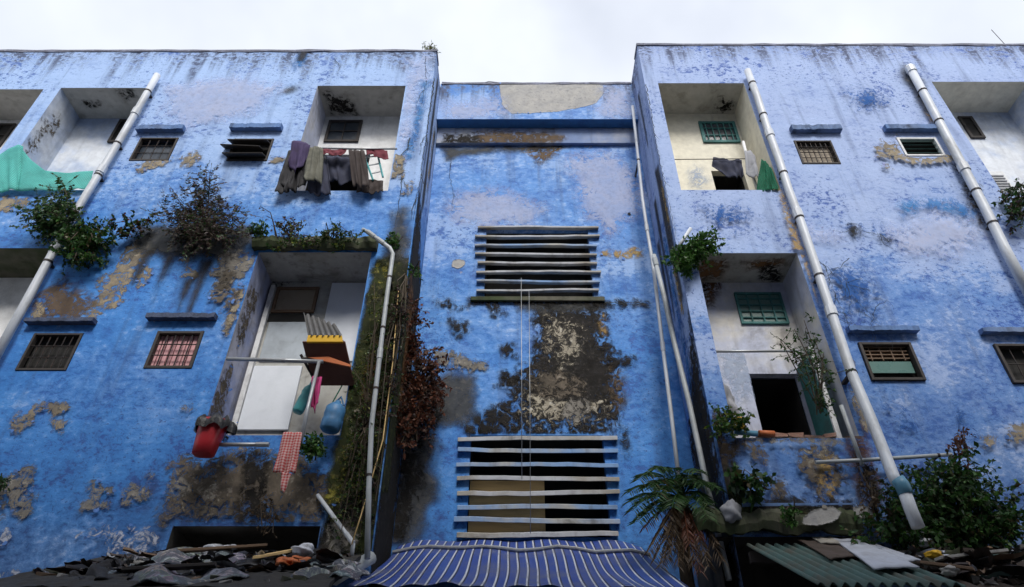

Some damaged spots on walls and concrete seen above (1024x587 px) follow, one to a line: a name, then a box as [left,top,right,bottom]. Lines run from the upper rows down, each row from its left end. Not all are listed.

flaking render [136,150,202,173]
flaking render [874,134,953,171]
flaking render [84,244,154,319]
leakage [132,225,252,312]
flaking render [178,249,259,347]
flaking render [9,401,71,434]
peeling [210,364,234,416]
leakage [318,206,650,549]
flaking render [0,464,40,546]
spalling [75,447,359,554]
flaking render [741,437,873,525]